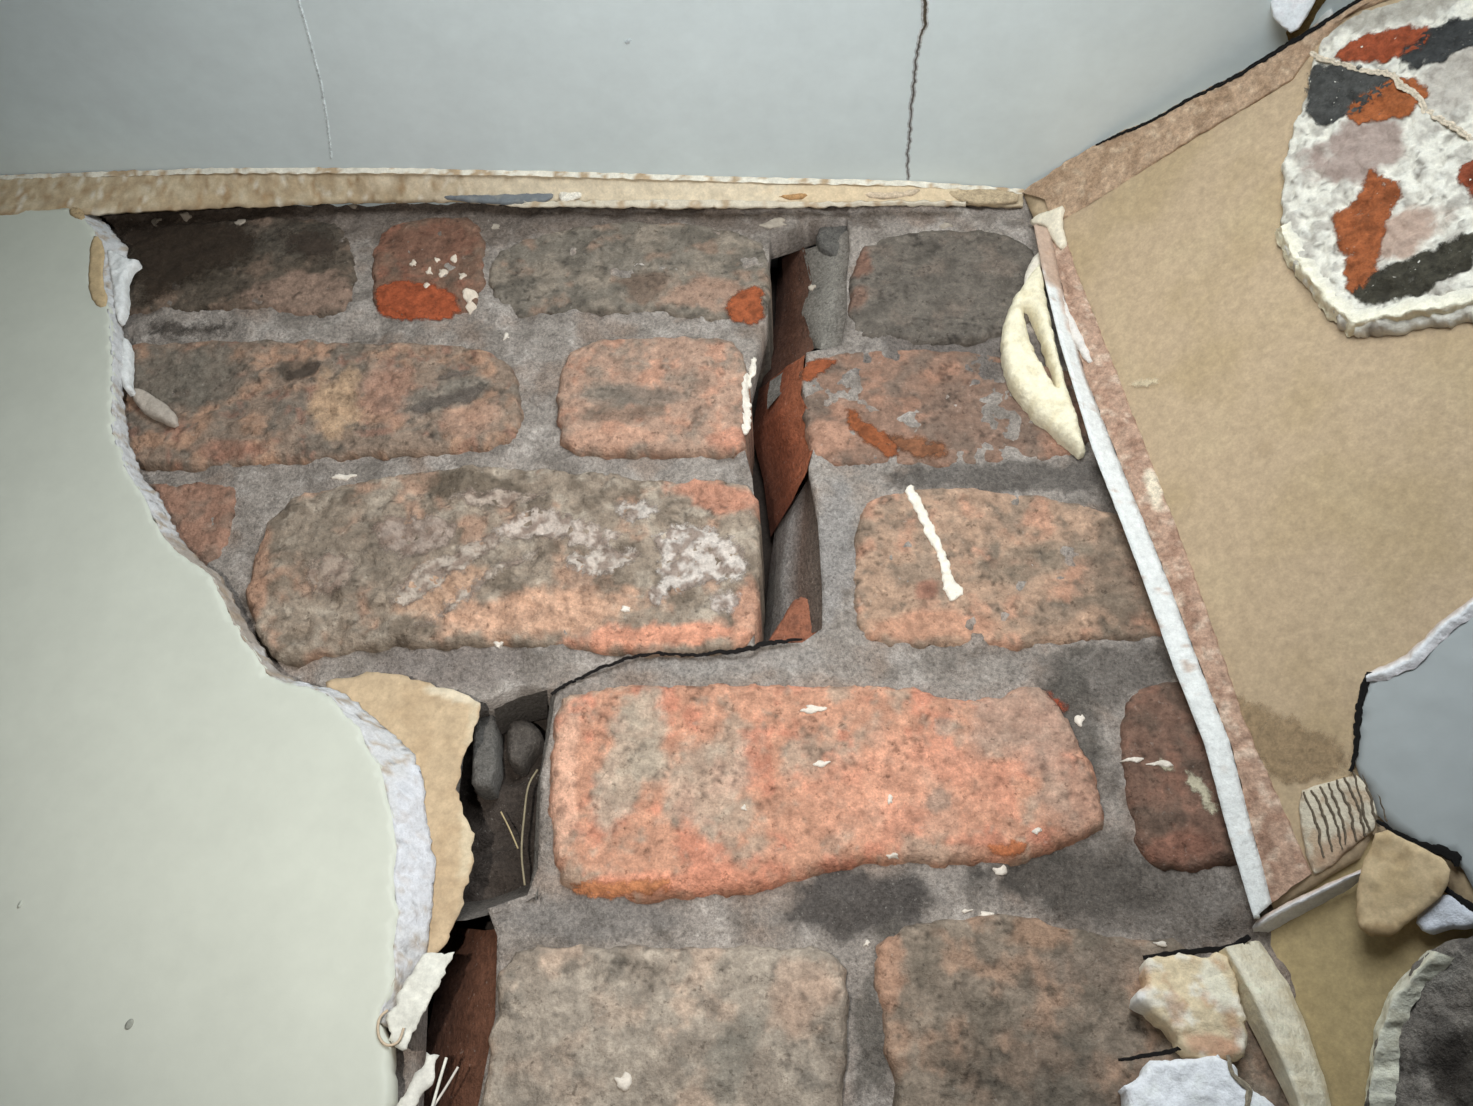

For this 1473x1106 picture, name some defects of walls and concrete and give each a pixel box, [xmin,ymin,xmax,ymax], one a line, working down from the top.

crack [905,0,929,180]
peeling [0,167,1024,220]
peeling [88,236,179,428]
spalling [374,280,461,321]
spalling [725,285,765,325]
spalling [801,358,837,382]
spalling [846,409,948,458]
spalling [1022,0,1473,937]
crack [424,226,850,1106]
spalling [571,877,670,900]
flaking render [1218,941,1331,1106]
spalling [1364,936,1473,1106]